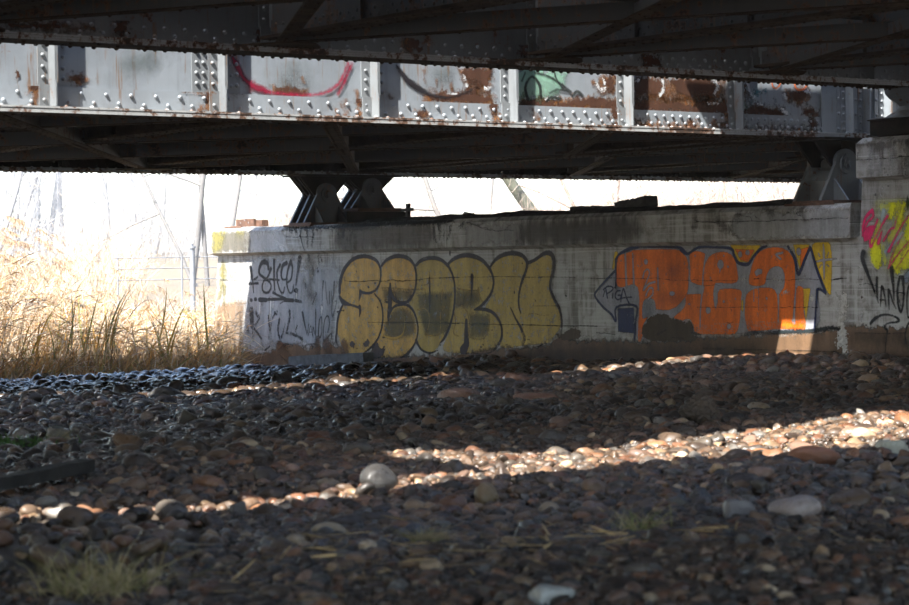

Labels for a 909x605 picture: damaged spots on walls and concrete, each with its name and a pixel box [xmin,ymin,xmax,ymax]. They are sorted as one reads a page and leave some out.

corrosion [28,86,39,105]
corrosion [68,74,88,86]
leakage [211,226,348,366]
leakage [374,291,909,362]